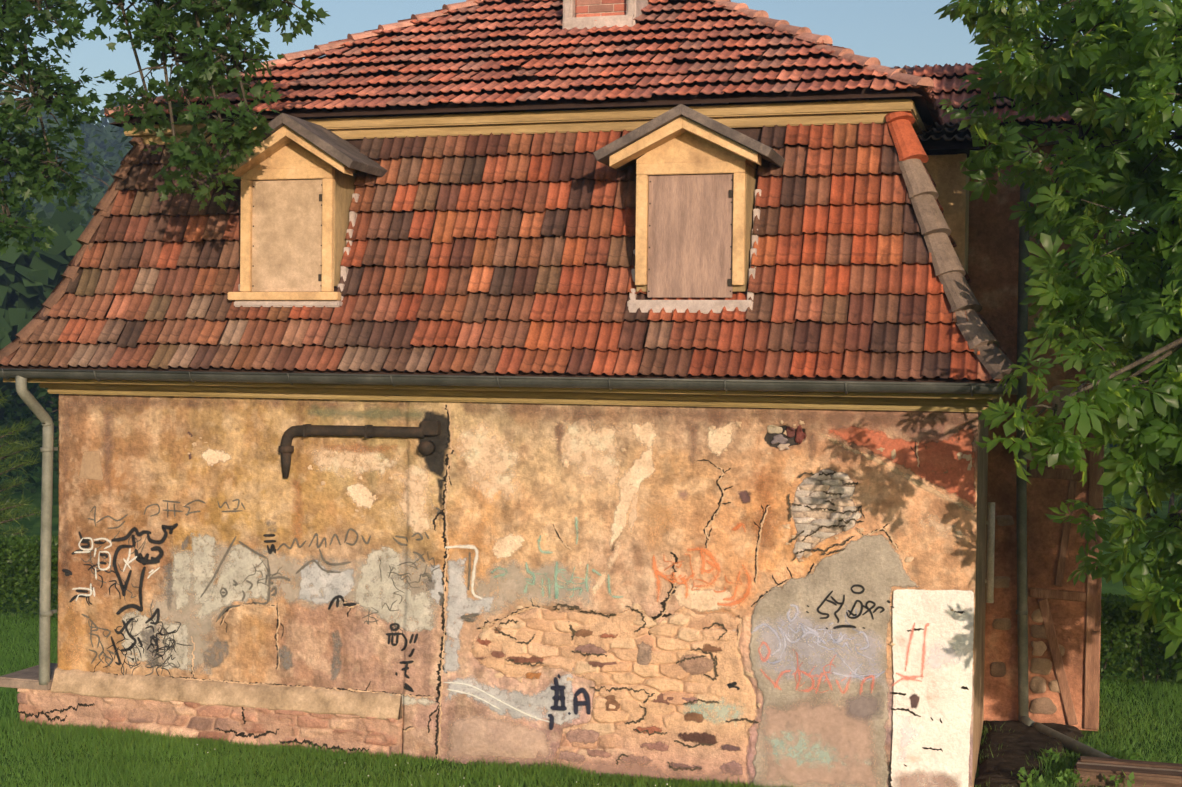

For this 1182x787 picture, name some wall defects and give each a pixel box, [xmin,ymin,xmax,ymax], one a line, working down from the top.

crack [697,459,733,550]
spalling [782,469,865,562]
crack [94,405,454,760]
crack [477,598,547,631]
crack [648,552,678,637]
crack [736,505,817,652]
flaking render [470,584,761,785]